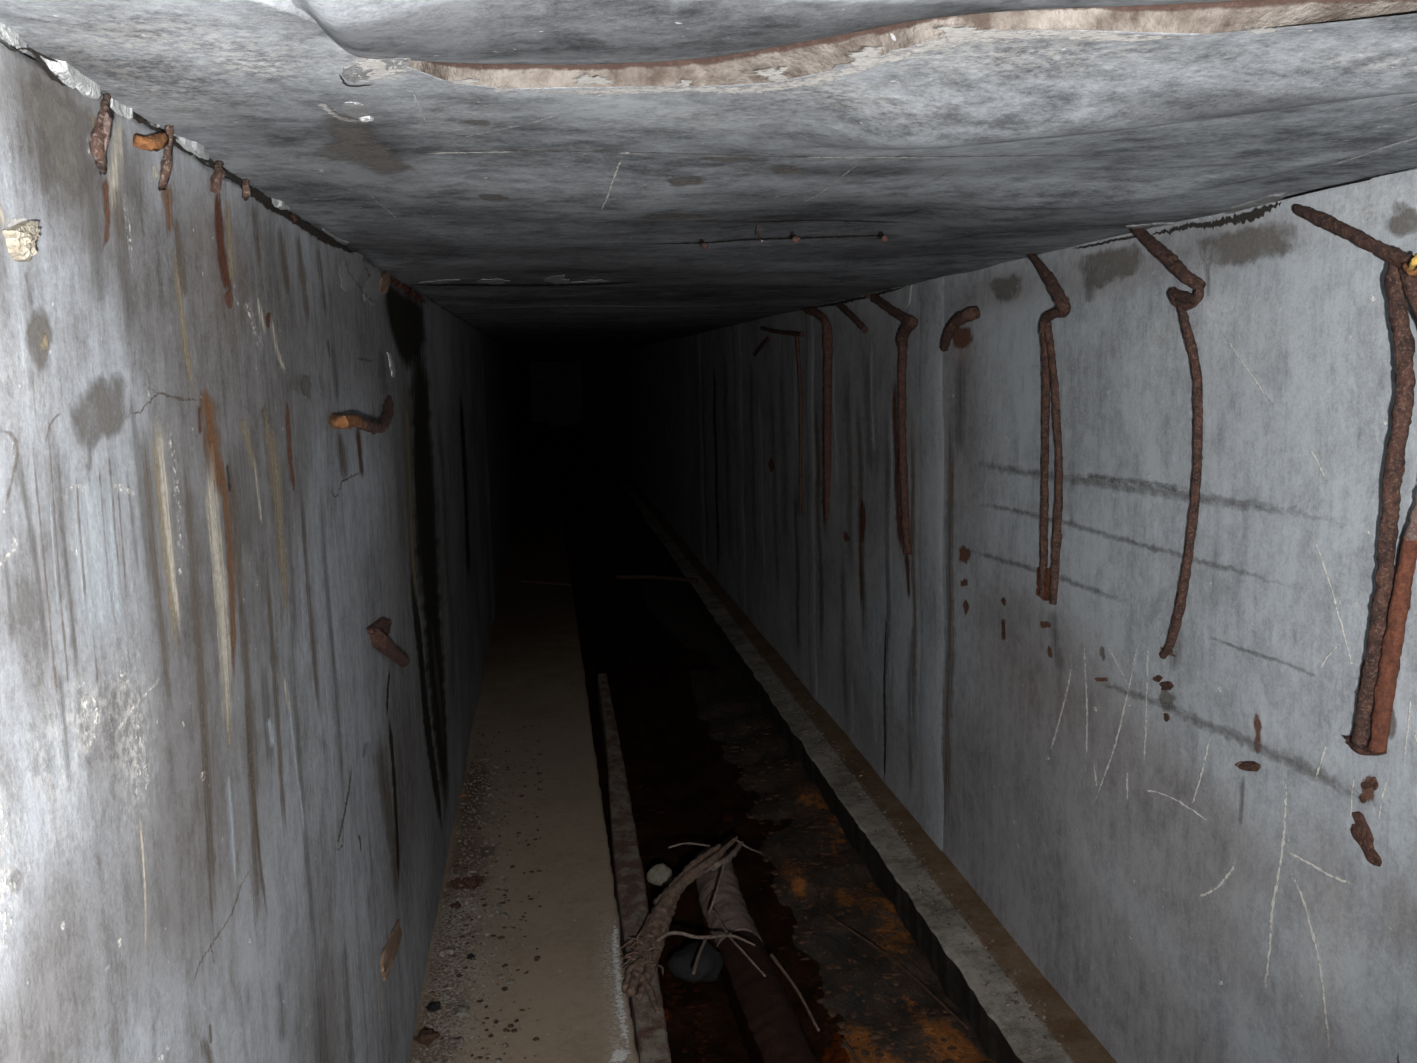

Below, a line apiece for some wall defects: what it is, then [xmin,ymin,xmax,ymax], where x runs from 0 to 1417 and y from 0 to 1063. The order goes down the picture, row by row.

spalling [318,0,1417,123]
rust [103,124,132,251]
spalling [0,22,636,378]
rust [215,193,285,369]
rust [280,233,325,315]
damp [73,378,135,445]
rust [152,166,242,743]
rust [242,404,295,608]
spalling [329,395,394,435]
rust [892,386,910,595]
rust [228,779,236,879]